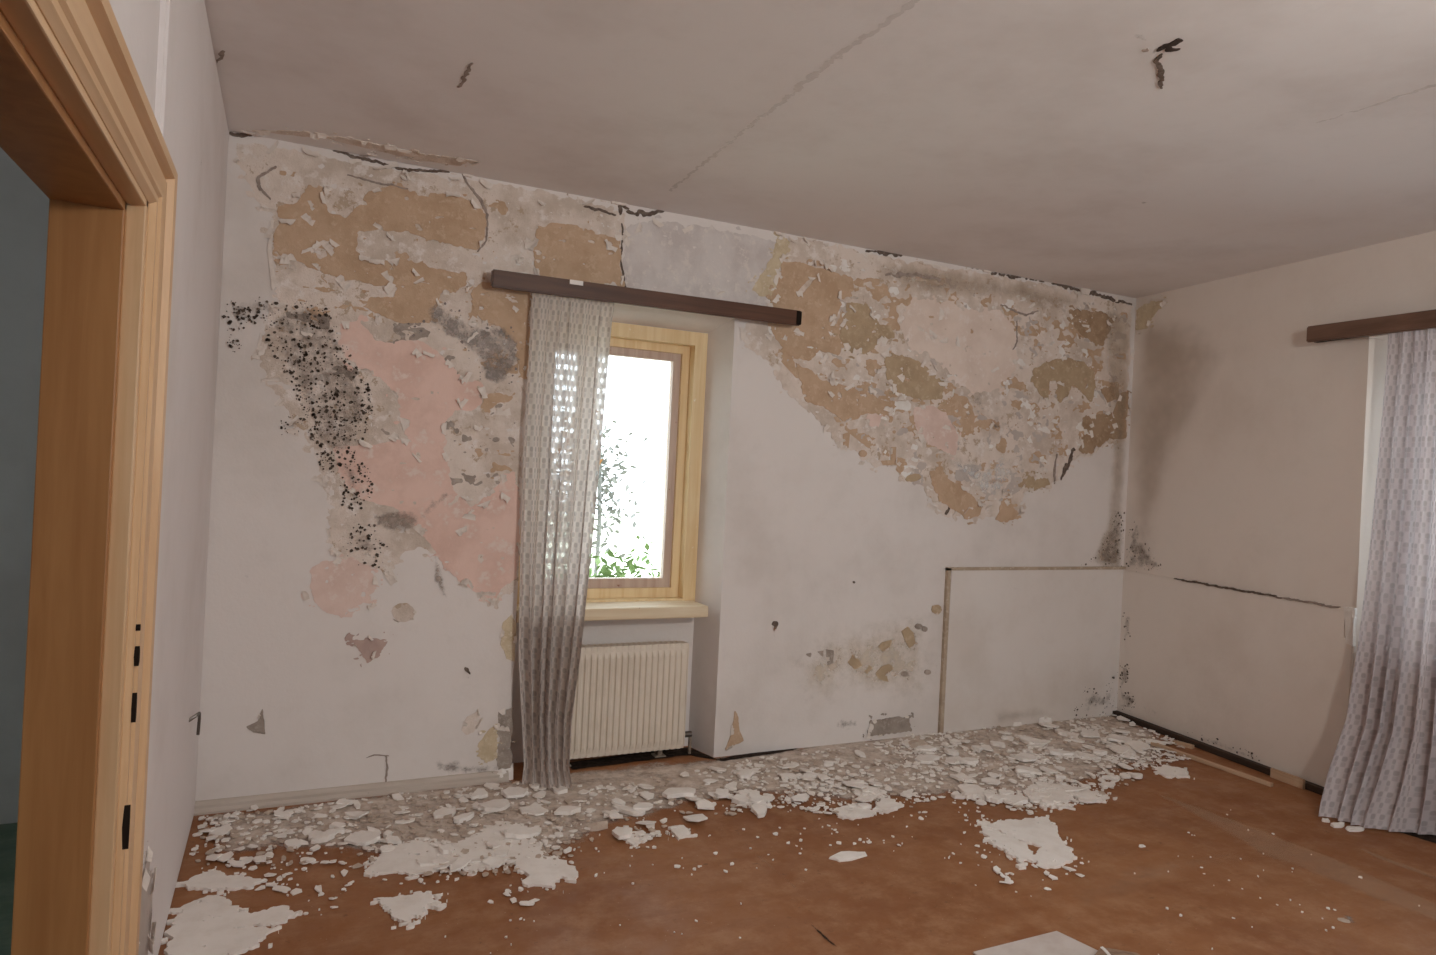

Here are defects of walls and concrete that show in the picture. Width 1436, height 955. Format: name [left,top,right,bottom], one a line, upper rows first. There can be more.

leakage [222,297,415,568]
peeling [232,127,1167,667]
peeling [806,605,942,682]
peeling [725,711,744,751]
peeling [138,847,157,955]